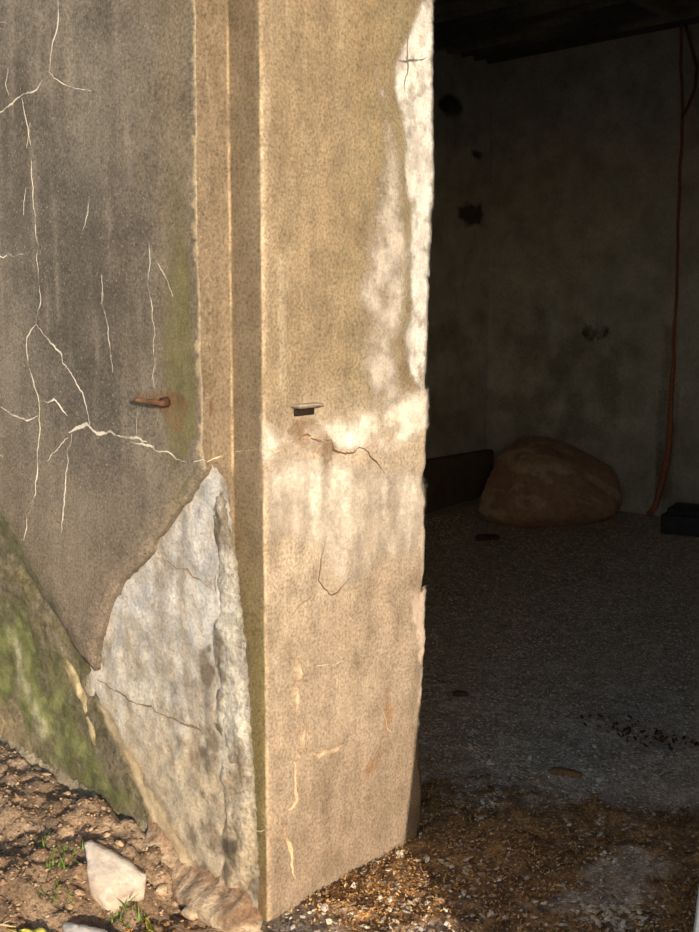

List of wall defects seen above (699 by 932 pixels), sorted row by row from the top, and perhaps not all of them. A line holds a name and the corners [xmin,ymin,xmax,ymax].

crack [0,13,395,534]
spalling [0,466,260,909]
crack [293,538,353,614]